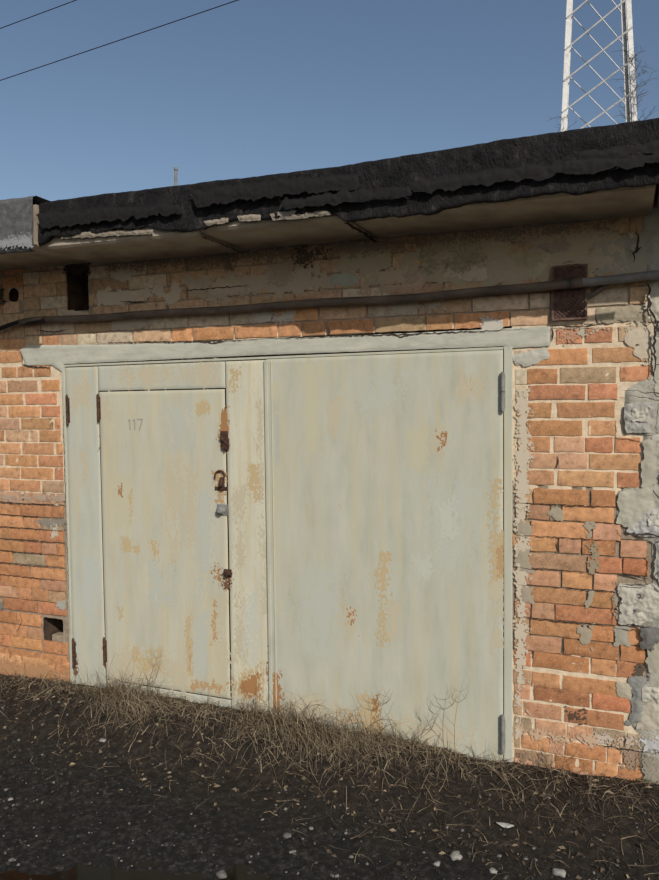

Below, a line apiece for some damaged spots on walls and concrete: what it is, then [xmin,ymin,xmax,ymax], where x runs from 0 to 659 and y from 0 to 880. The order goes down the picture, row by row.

peeling [191,140,659,226]
peeling [36,202,183,239]
corrosion [68,376,92,413]
corrosion [99,357,245,425]
corrosion [215,406,230,455]
spalling [624,401,655,433]
peeling [626,508,659,537]
corrosion [102,461,479,753]